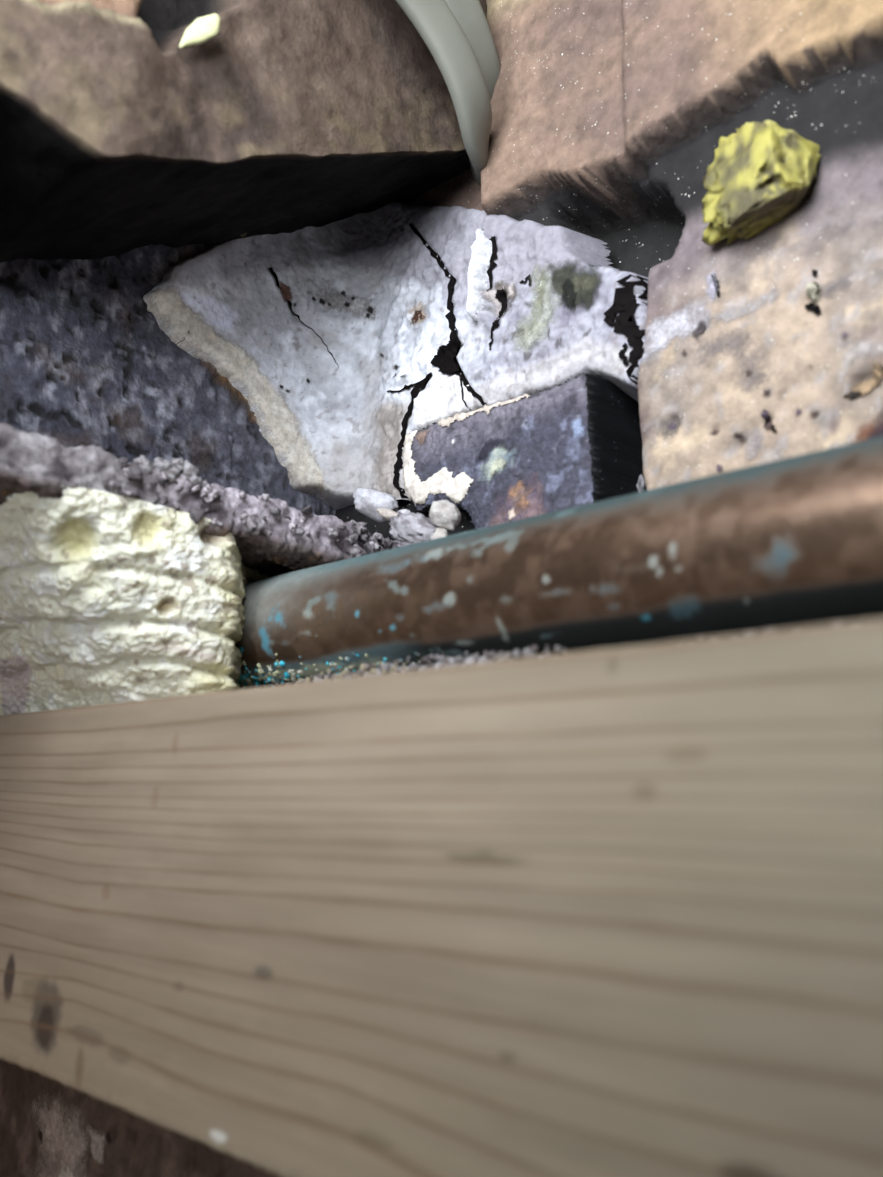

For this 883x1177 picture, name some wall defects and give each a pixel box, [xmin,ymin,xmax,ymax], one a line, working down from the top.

crack [268,267,339,368]
crack [387,223,487,498]
crack [603,273,648,386]